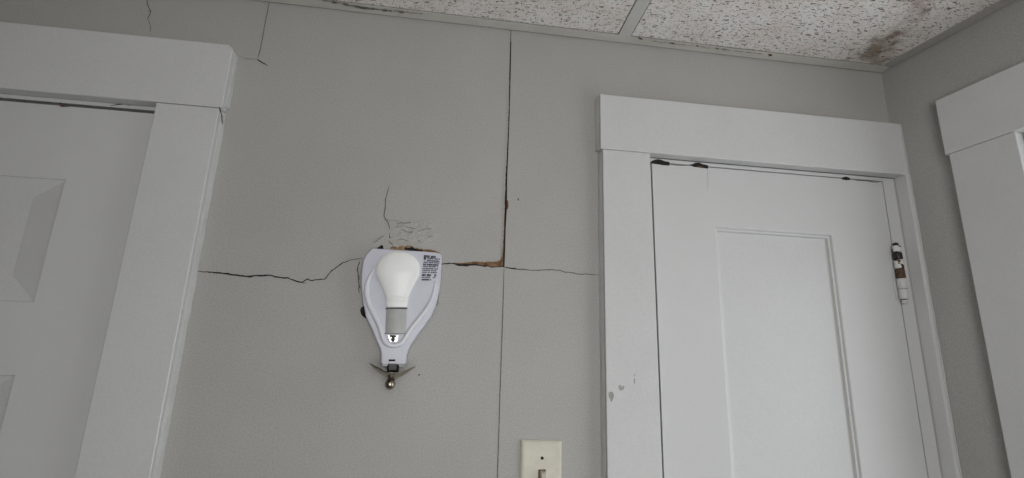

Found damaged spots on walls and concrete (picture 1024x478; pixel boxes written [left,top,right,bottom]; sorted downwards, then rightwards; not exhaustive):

crack [242,2,270,66]
crack [198,258,363,283]
crack [443,31,599,478]